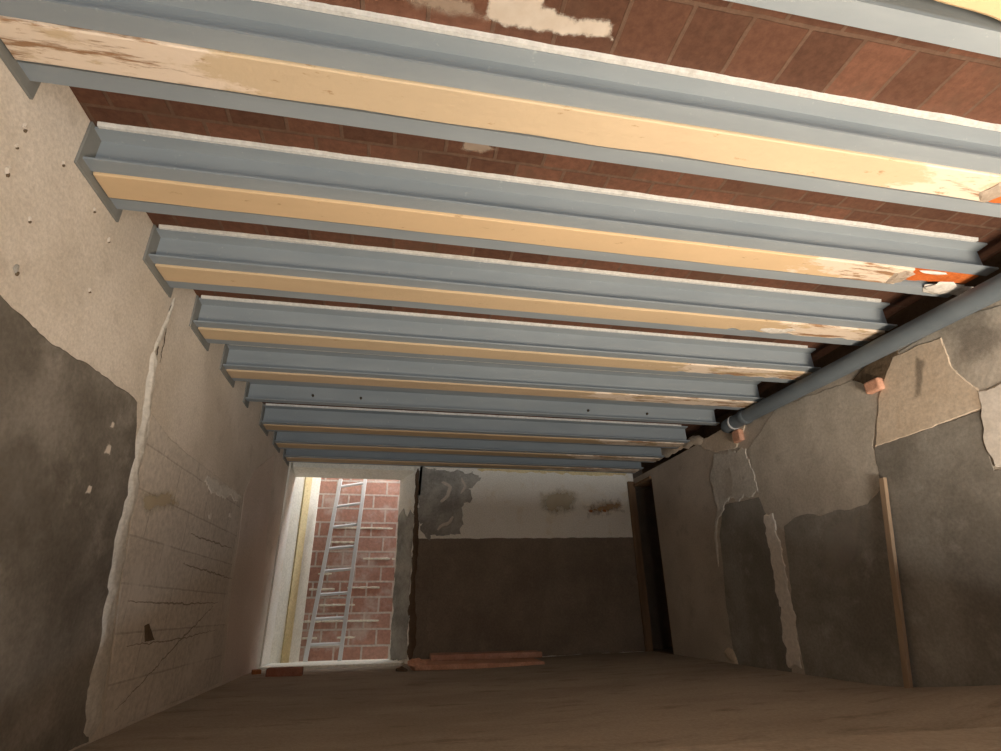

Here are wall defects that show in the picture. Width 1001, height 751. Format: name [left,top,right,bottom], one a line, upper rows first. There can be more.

crack [114,600,218,712]